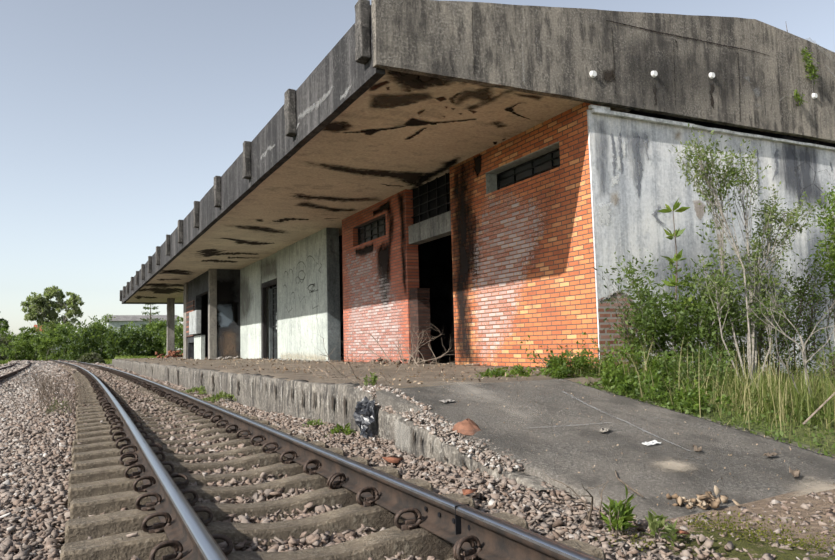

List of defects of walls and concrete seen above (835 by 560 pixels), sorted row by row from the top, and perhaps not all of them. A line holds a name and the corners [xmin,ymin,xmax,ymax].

water stain [372,70,452,108]
water stain [449,82,497,110]
water stain [603,70,615,82]
crack [606,20,769,122]
crack [505,103,531,120]
water stain [324,121,351,132]
water stain [596,124,649,196]
water stain [773,144,827,207]
water stain [293,194,373,219]
water stain [230,218,309,233]
water stain [310,163,427,290]
water stain [195,238,275,263]